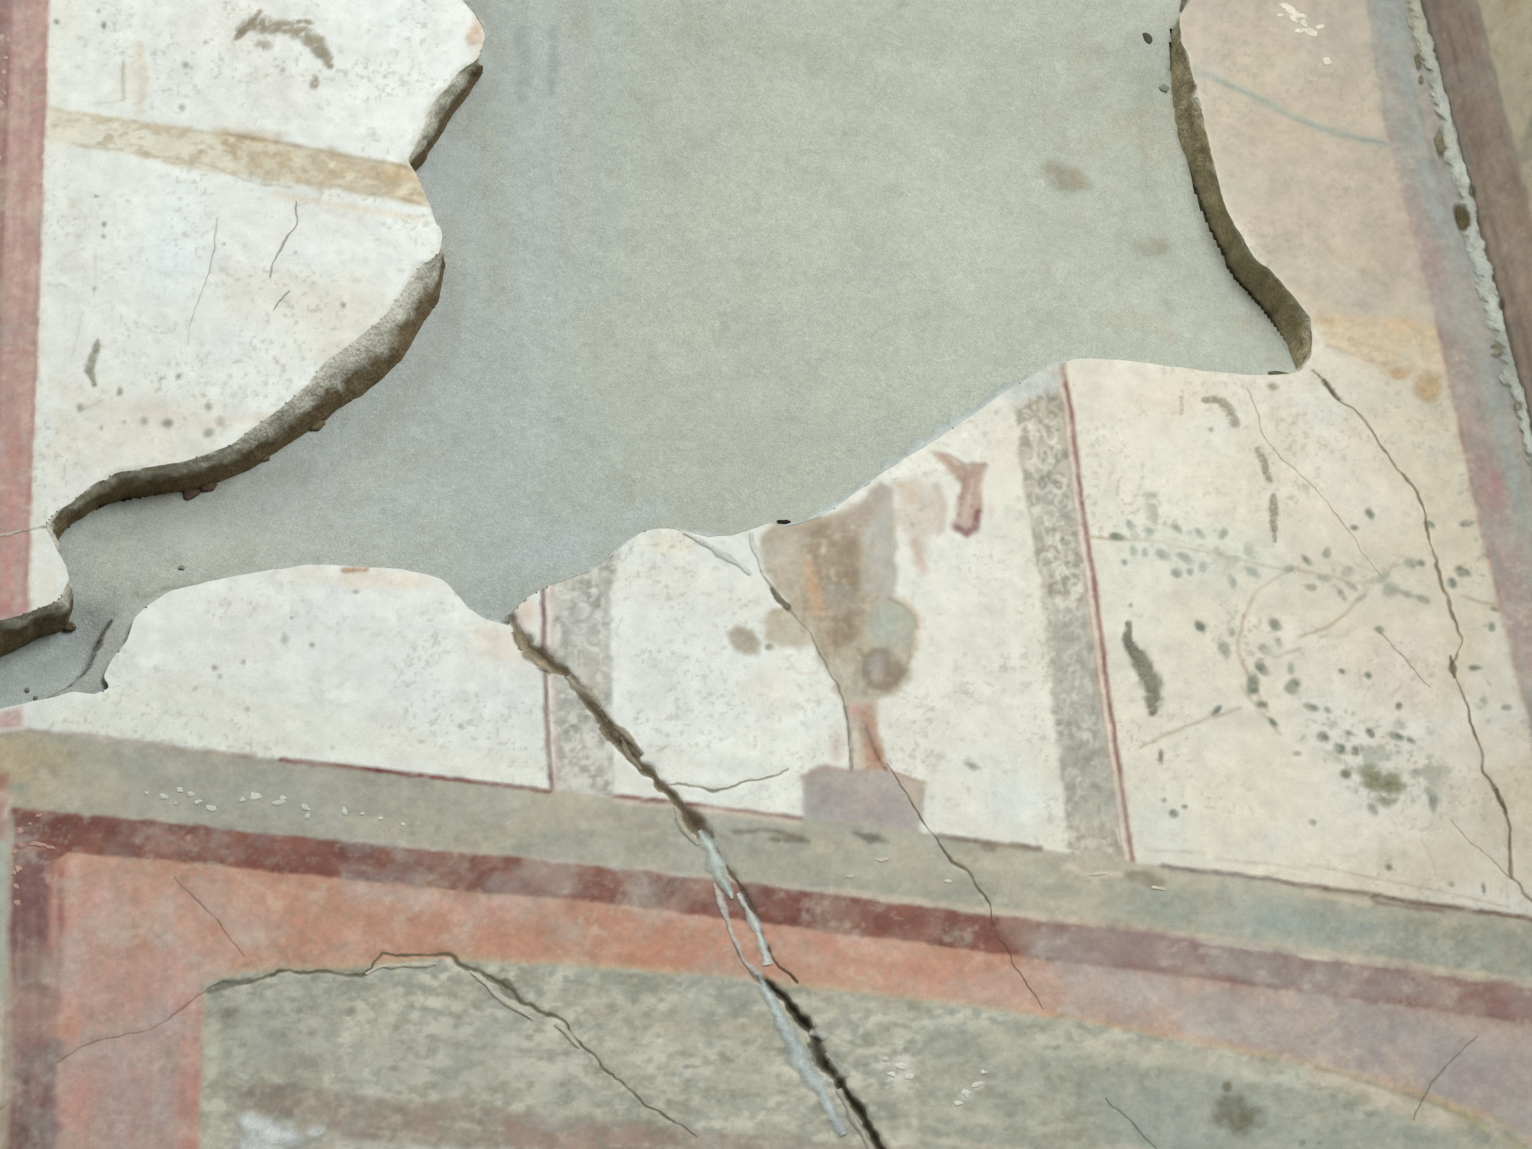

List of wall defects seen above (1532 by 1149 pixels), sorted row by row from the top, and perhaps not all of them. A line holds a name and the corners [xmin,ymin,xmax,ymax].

flaking render [0,0,1312,709]
crack [1408,0,1532,455]
crack [174,876,698,1137]
crack [506,613,887,1149]
crack [1318,374,1532,901]